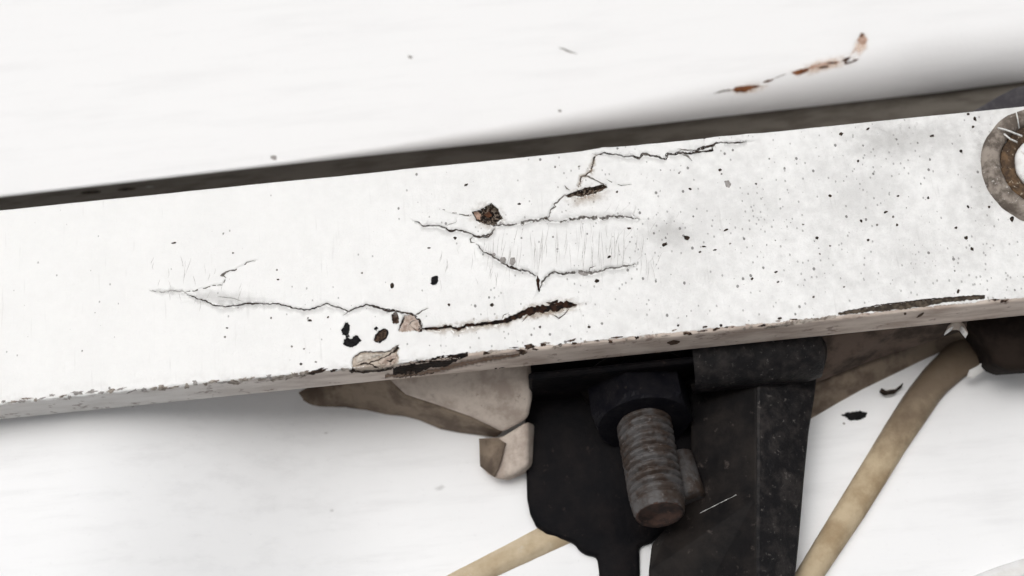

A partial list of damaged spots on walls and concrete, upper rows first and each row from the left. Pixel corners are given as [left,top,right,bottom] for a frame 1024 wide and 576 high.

corrosion [713,33,868,94]
crack [578,142,743,187]
corrosion [1000,128,1024,199]
hole [443,203,503,227]
crack [152,205,636,331]
spalling [1,289,1009,403]